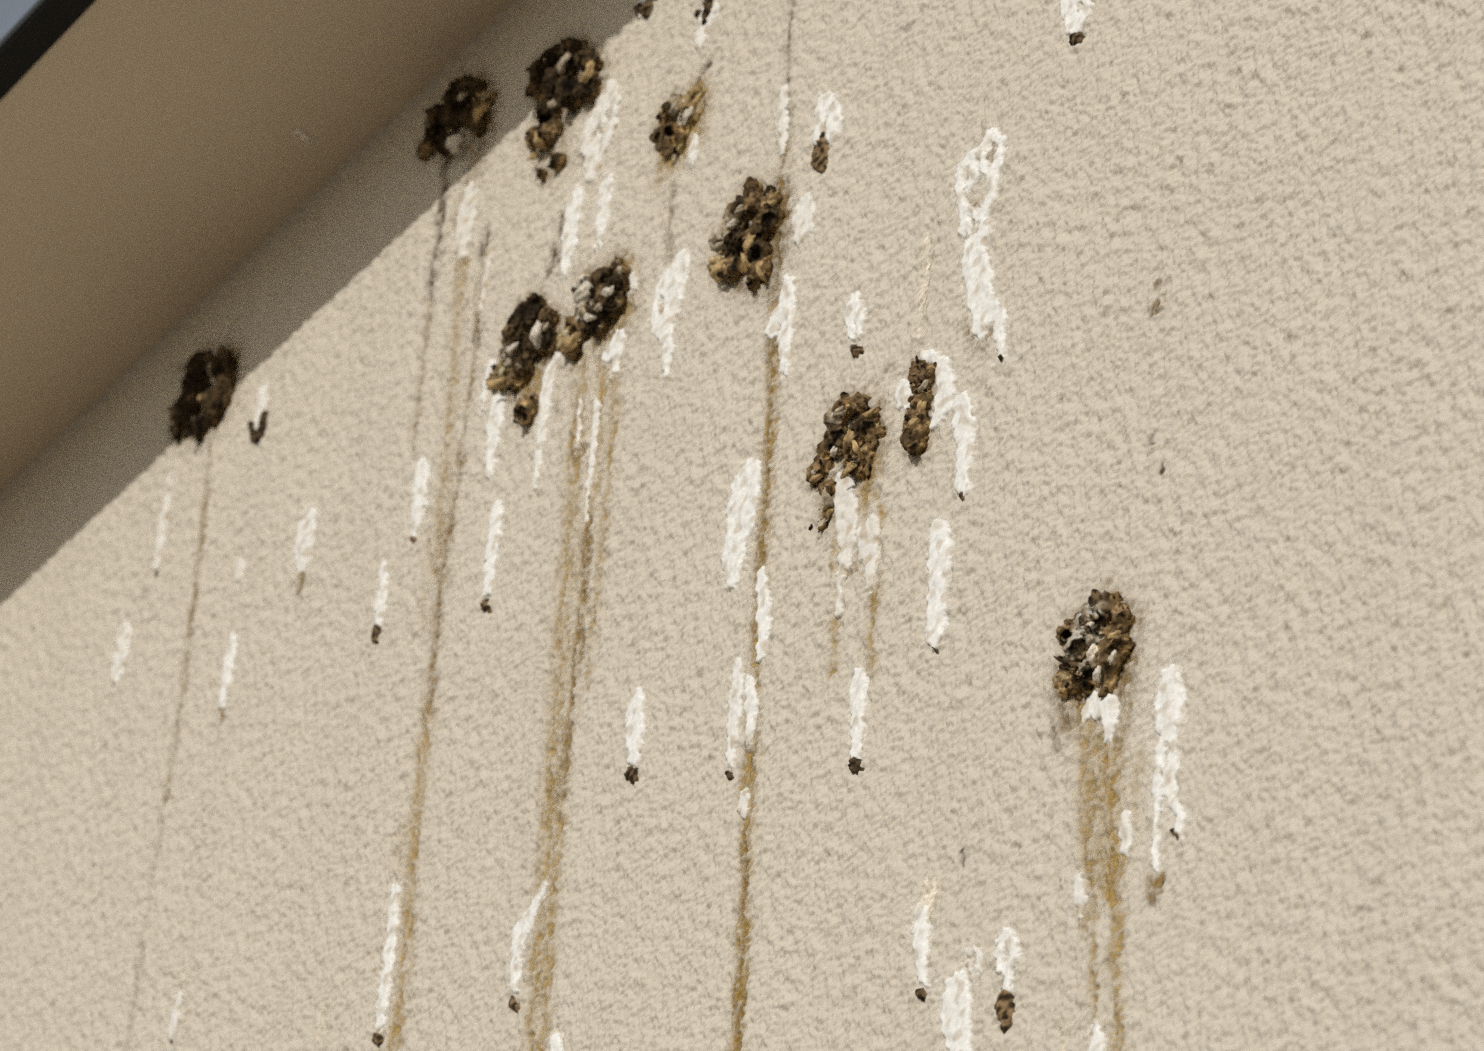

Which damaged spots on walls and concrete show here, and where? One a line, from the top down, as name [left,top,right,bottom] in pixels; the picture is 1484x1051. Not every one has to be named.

water stain [429,156,449,292]
water stain [775,145,789,269]
water stain [756,338,780,574]
water stain [388,372,475,1051]
water stain [527,362,617,1051]
water stain [732,719,757,1051]
water stain [1059,698,1126,1051]